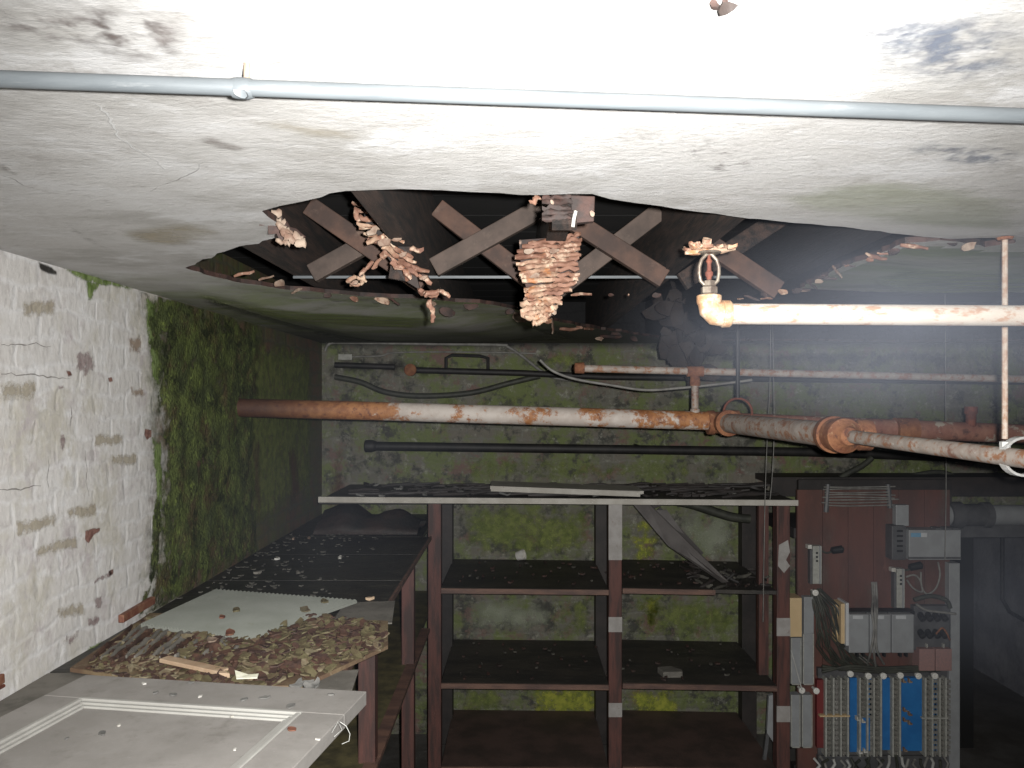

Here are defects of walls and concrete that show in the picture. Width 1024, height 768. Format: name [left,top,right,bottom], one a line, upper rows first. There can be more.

leakage [895,24,981,70]
flaking render [259,208,307,248]
flaking render [366,226,407,257]
spalling [947,242,976,251]
spalling [234,270,302,294]
spalling [737,243,929,301]
spalling [374,297,400,306]
spalling [505,309,527,322]
spalling [544,310,638,342]